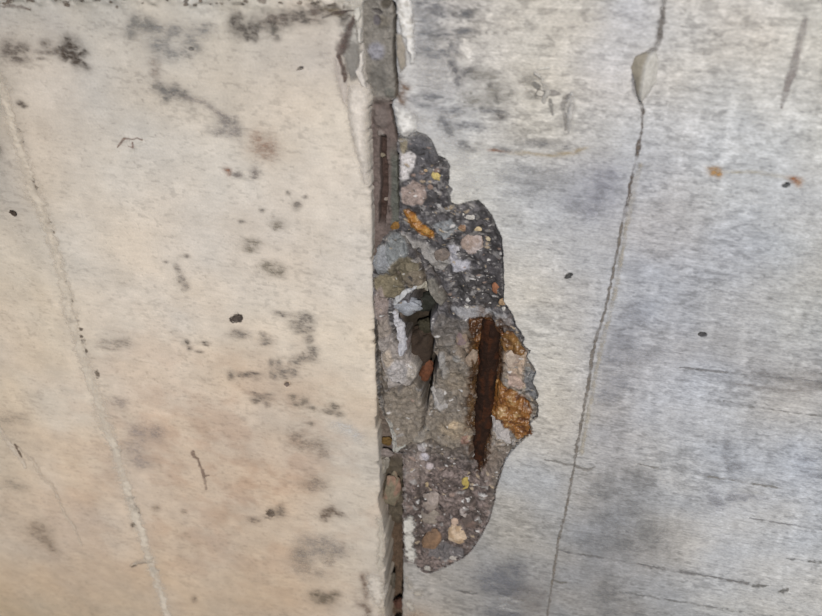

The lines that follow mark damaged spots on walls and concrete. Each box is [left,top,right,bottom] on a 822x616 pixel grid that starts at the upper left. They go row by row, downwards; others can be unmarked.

mould [3,43,27,61]
mould [40,37,87,67]
damp [128,16,198,57]
crack [655,6,665,50]
damp [154,86,210,107]
damp [230,0,369,183]
spalling [372,132,539,573]
crack [545,82,645,616]
corrosion [466,317,533,465]
crack [680,572,789,593]